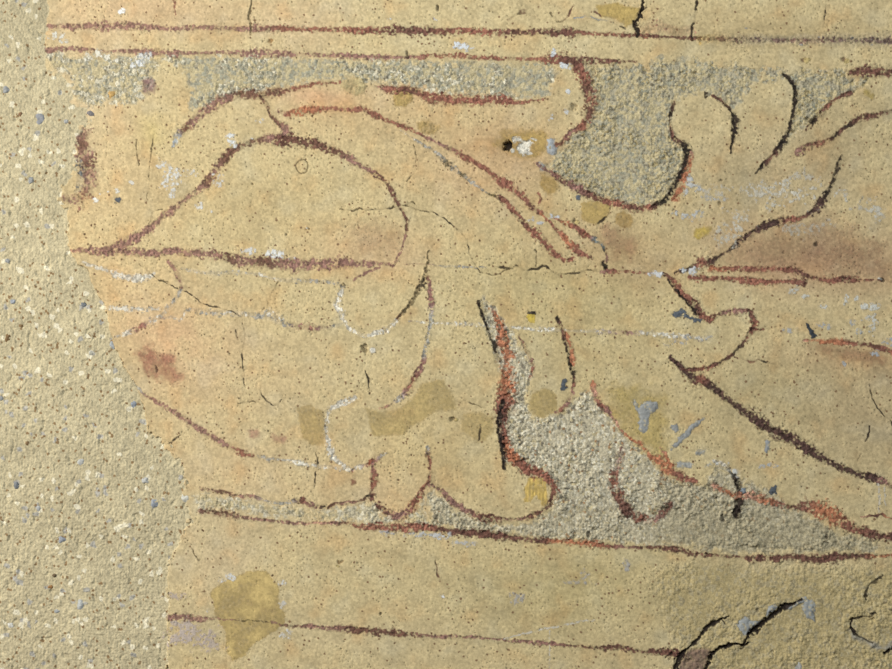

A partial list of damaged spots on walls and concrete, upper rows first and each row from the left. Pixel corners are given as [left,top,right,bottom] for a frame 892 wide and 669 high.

crack [632,0,647,38]
spalling [46,51,560,116]
spalling [539,54,870,206]
spalling [191,294,892,669]
crack [669,598,803,669]
crack [850,575,892,654]